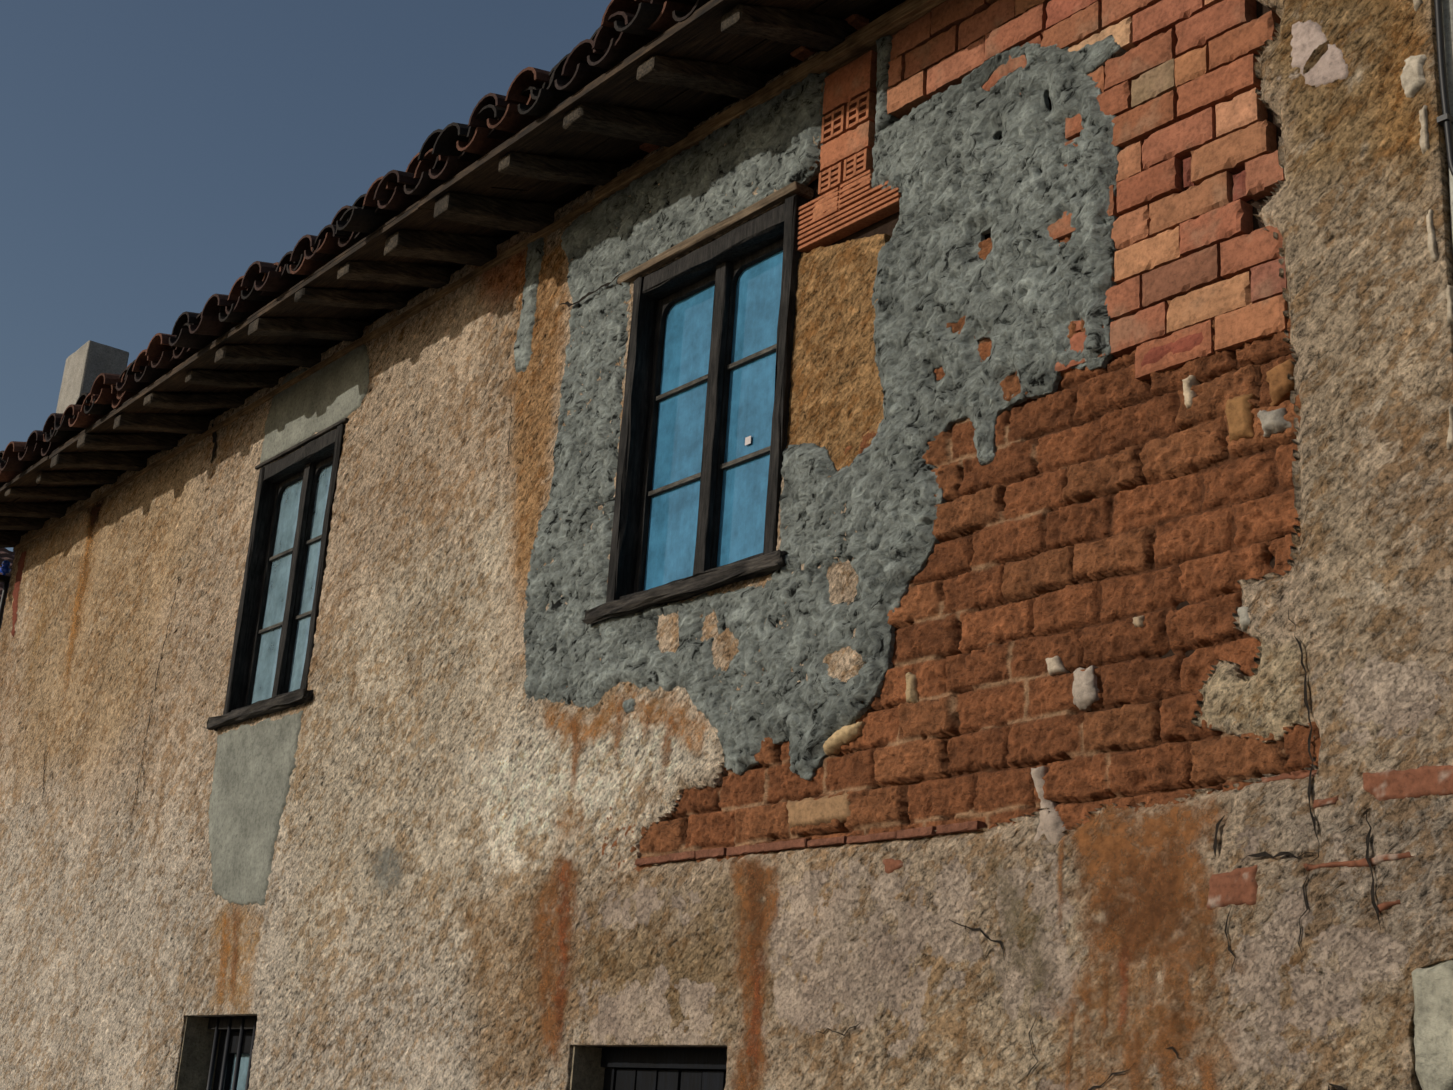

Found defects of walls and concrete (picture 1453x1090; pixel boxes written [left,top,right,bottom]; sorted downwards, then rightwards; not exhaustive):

flaking render [797,0,1348,380]
corrosion [535,860,577,1055]
corrosion [731,860,778,1090]
corrosion [1058,798,1218,1090]
crack [1224,906,1236,972]
crack [1213,609,1320,953]
crack [1365,811,1381,930]
spalling [1411,959,1453,1090]